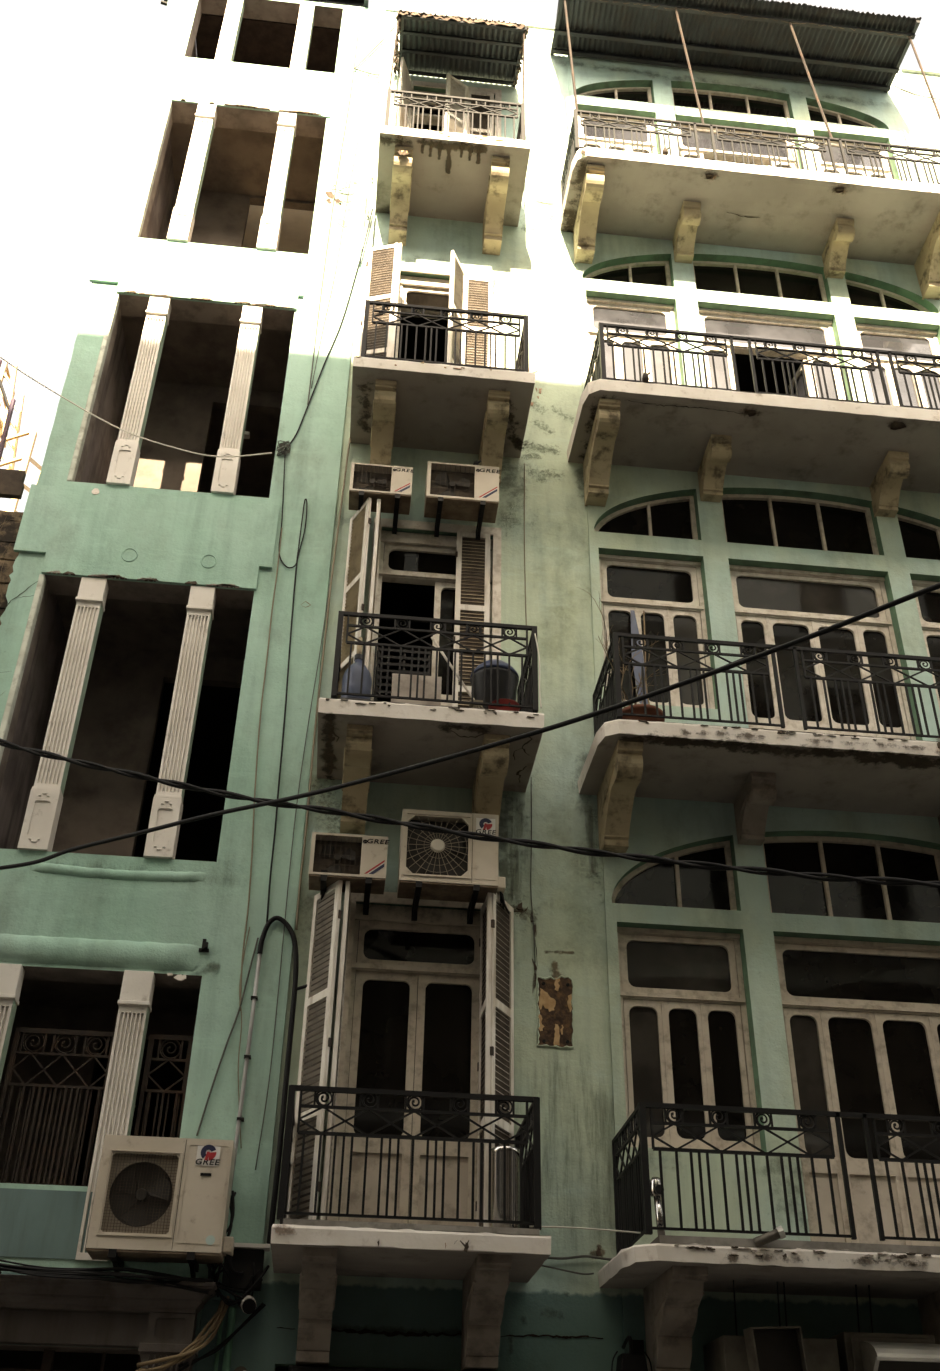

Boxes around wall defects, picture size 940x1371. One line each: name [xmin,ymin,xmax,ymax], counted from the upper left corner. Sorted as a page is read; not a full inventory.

water stain [380,135,487,174]
peeling [537,962,574,1049]
peeling [676,1244,825,1257]
peeling [862,1252,931,1261]